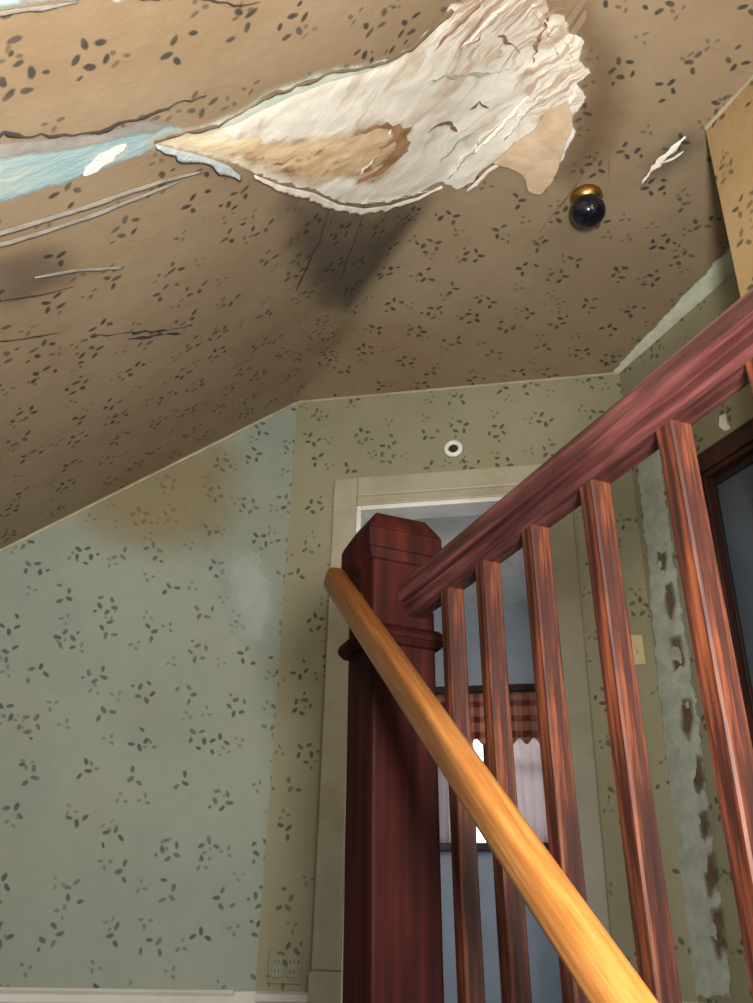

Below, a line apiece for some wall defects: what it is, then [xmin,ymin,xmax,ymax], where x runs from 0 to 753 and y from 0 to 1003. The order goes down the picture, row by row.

flaking render [153,0,590,216]